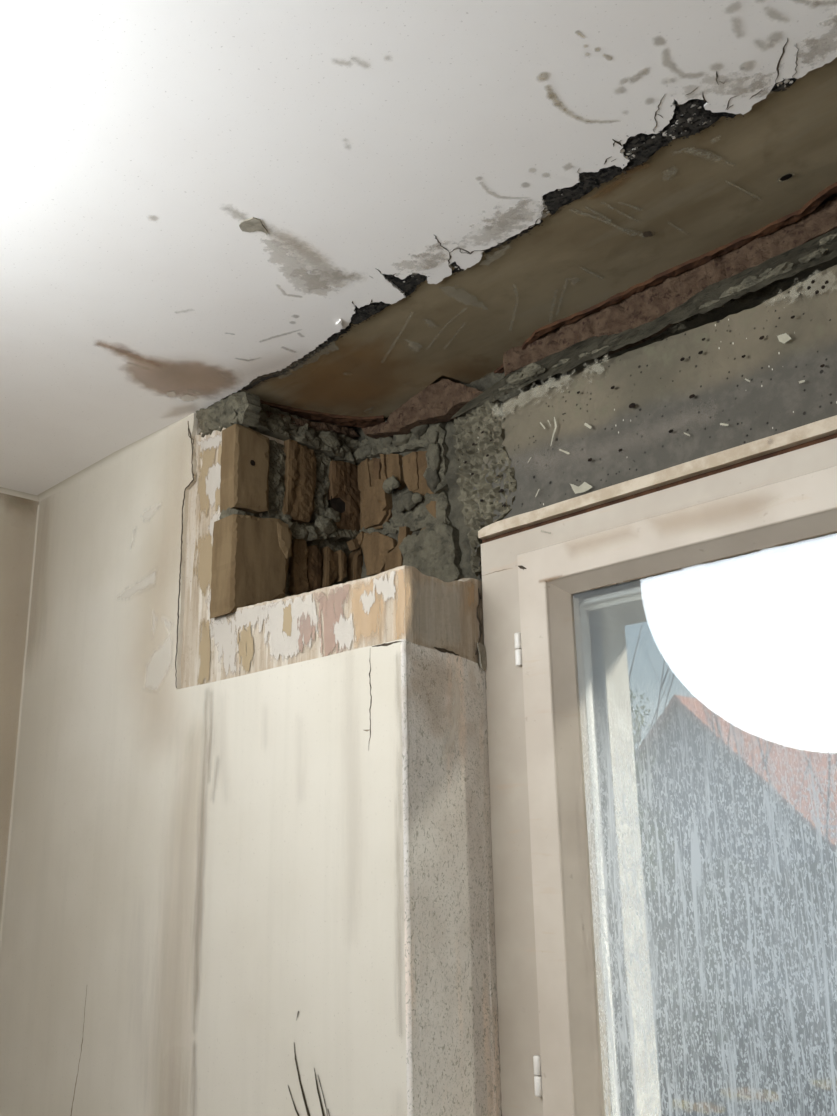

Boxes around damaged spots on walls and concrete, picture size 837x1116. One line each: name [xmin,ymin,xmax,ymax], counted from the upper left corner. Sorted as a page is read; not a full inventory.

flaking render [750,38,799,99]
flaking render [434,87,744,273]
peeling [239,217,268,235]
flaking render [370,268,429,297]
flaking render [242,300,391,391]
peeling [193,433,410,685]
peeling [477,643,487,672]